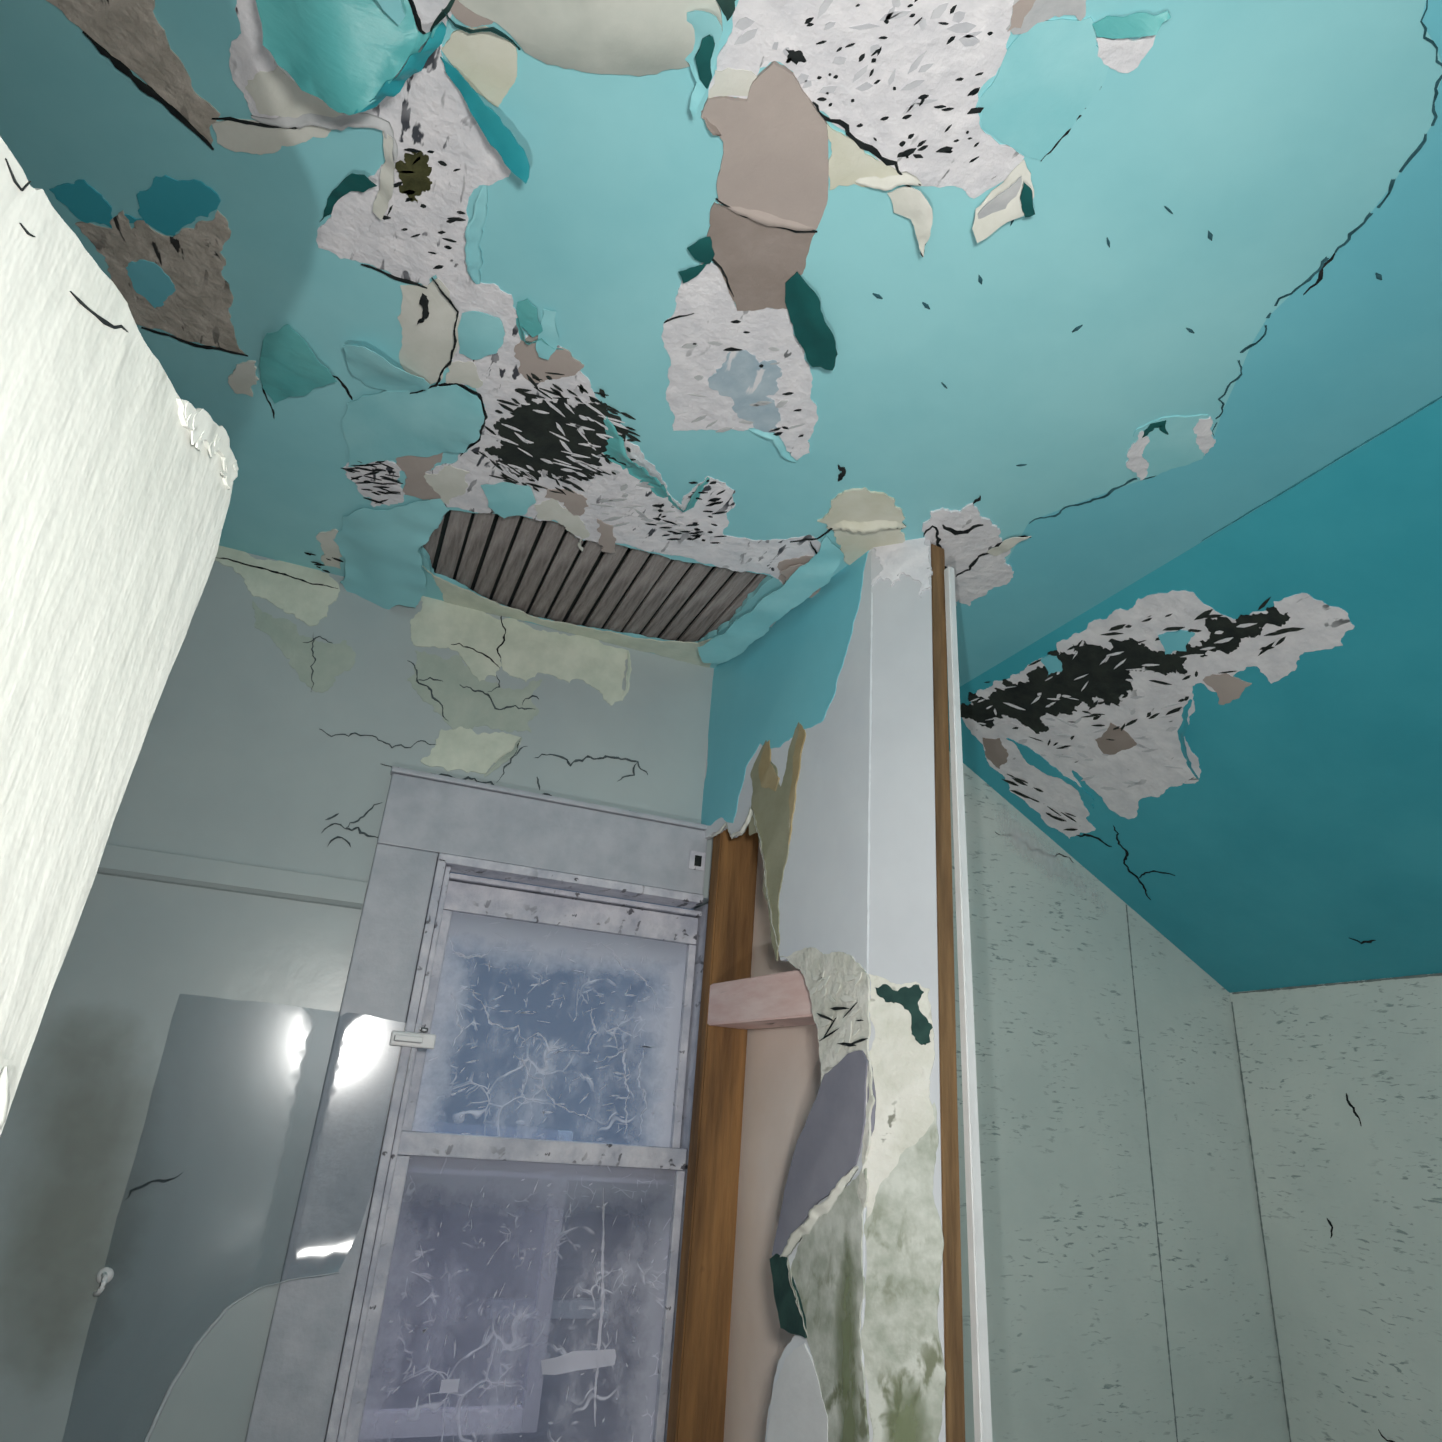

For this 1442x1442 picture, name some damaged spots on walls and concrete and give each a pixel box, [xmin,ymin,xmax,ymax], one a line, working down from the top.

peeling [661,0,1171,463]
crack [1212,0,1442,435]
peeling [46,0,1031,777]
crack [1029,476,1155,524]
peeling [1028,609,1222,666]
peeling [1258,627,1305,656]
crack [320,661,648,811]
crack [322,802,382,847]
crack [995,825,1175,900]
peeling [710,722,935,1442]
leakage [839,1251,856,1442]
leakage [890,1397,921,1442]